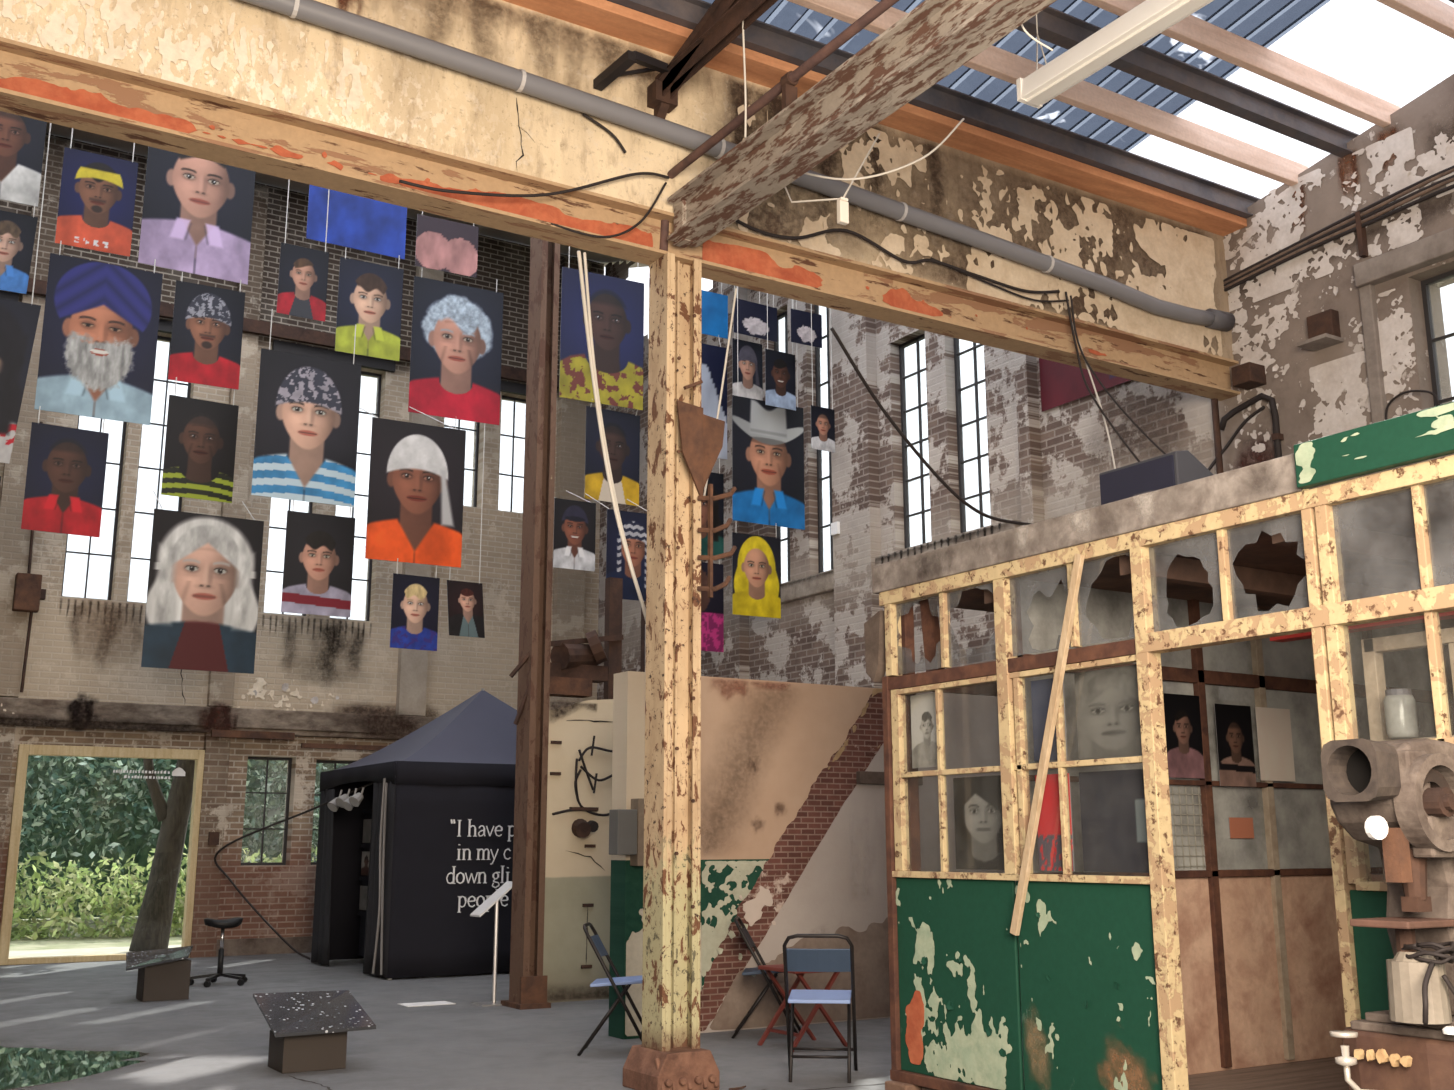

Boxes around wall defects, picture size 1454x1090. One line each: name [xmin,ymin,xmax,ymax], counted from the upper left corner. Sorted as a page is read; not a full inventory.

peeling [737,104,768,141]
peeling [839,128,929,204]
peeling [702,211,823,288]
peeling [787,194,841,256]
peeling [865,127,1454,452]
peeling [1295,289,1454,484]
flaking render [700,688,883,1031]
peeling [896,888,1012,1090]
rust [1104,1050,1146,1090]